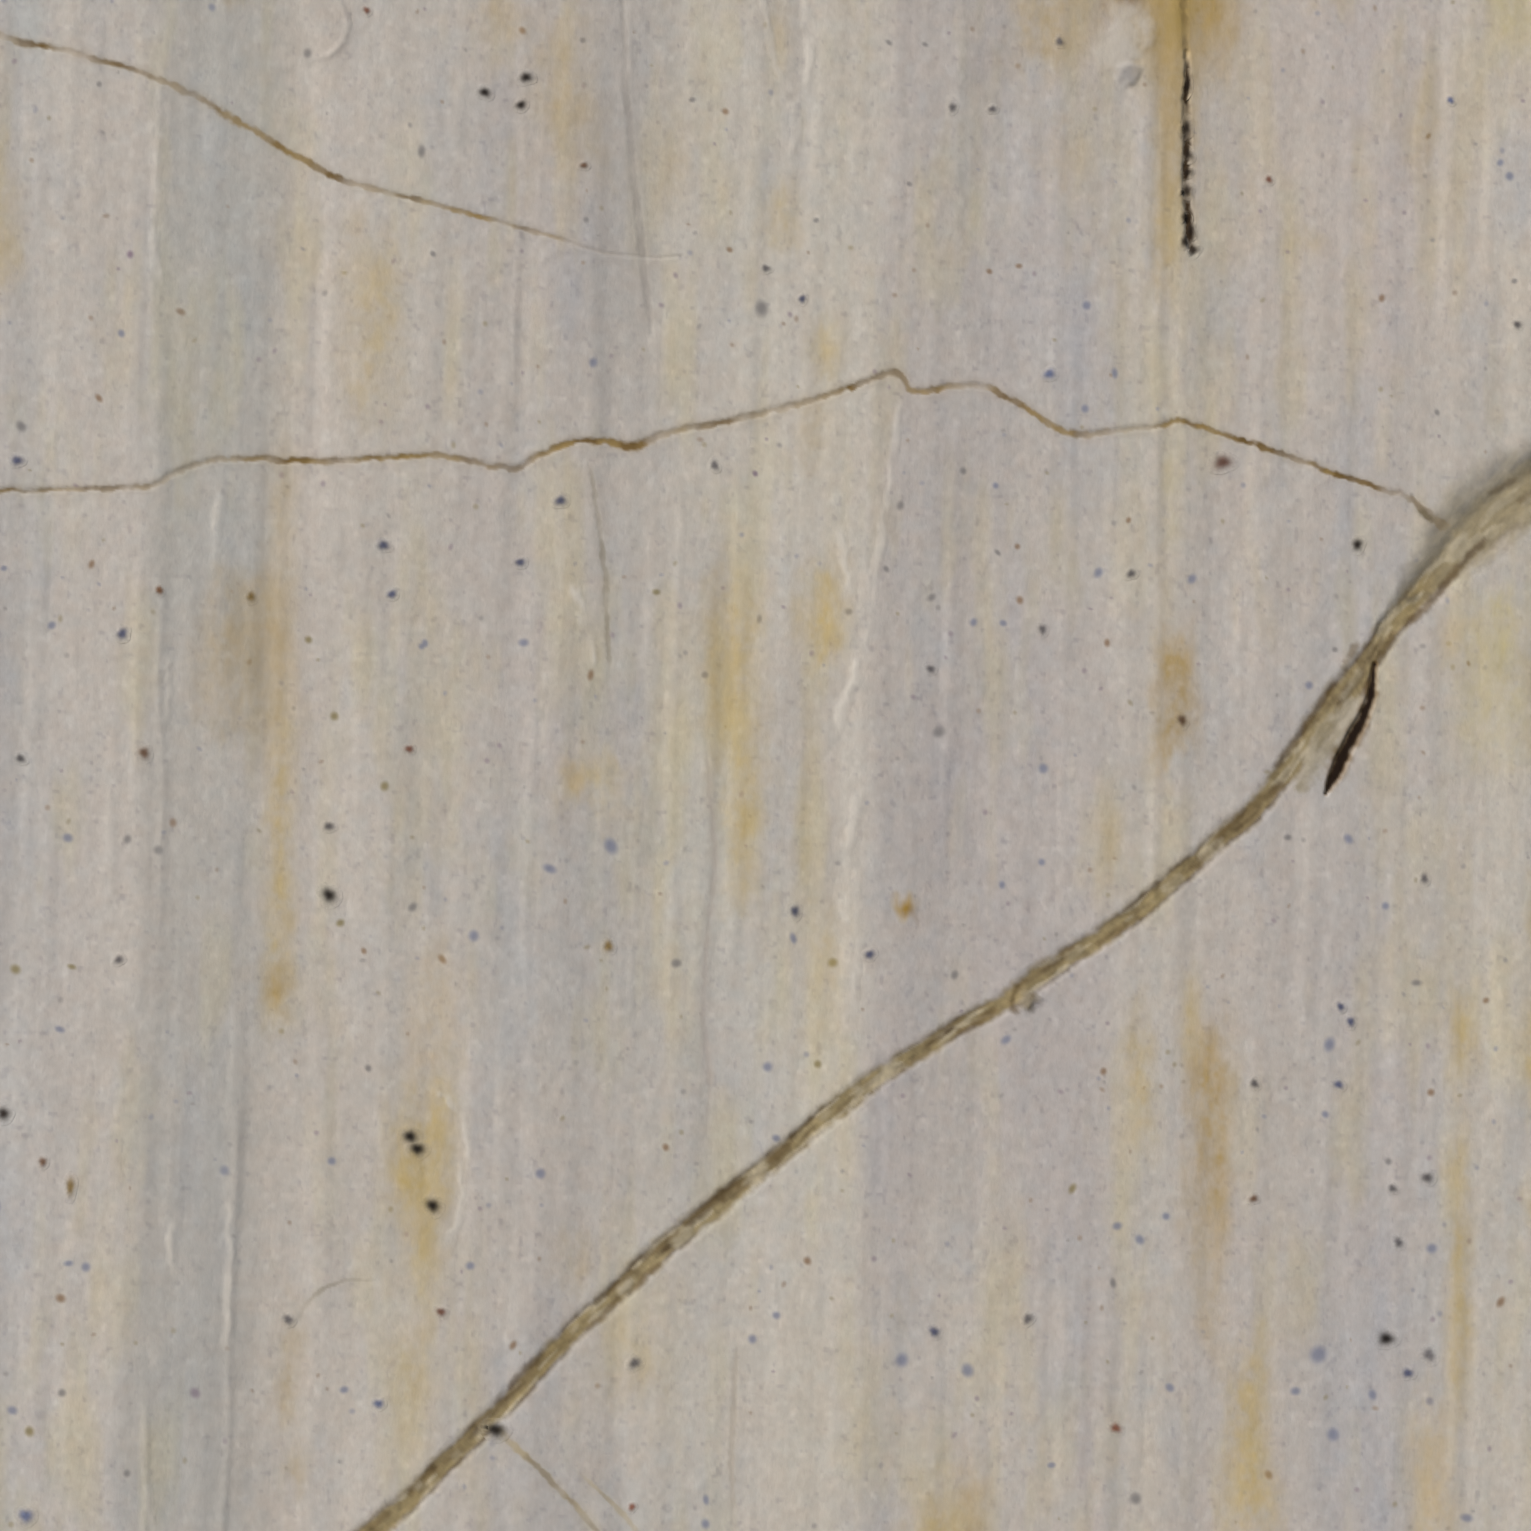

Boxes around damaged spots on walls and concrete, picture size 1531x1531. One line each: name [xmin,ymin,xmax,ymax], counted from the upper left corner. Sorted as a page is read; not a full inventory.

crack [0,24,659,262]
crack [1171,0,1205,260]
crack [0,361,1531,1531]